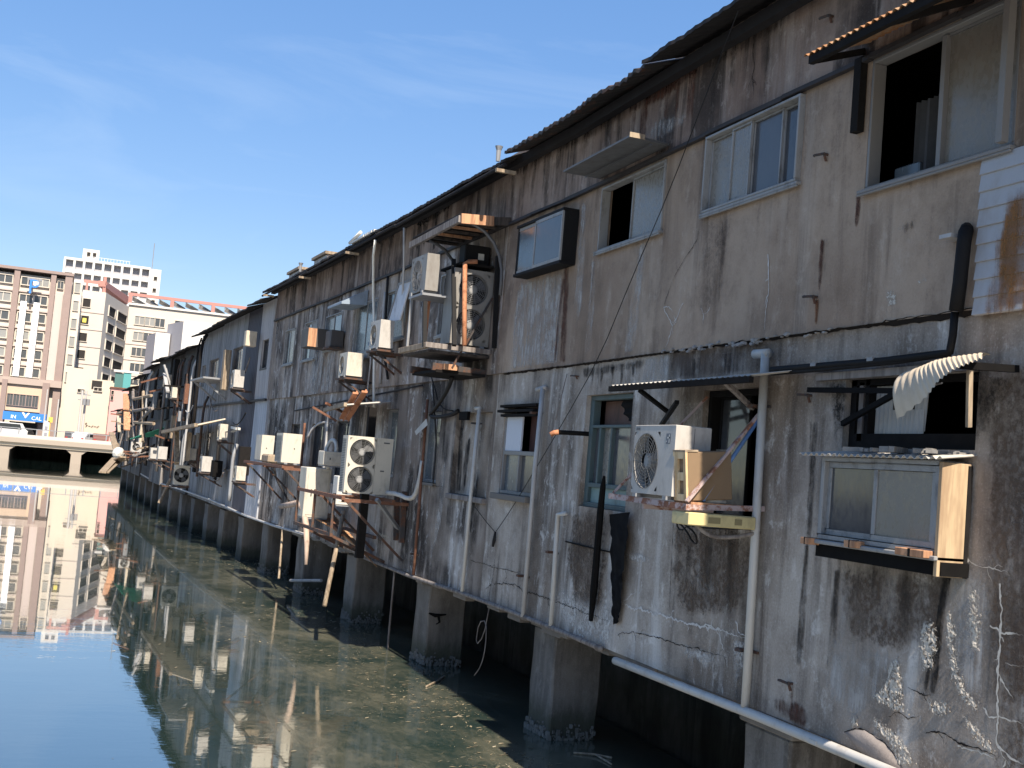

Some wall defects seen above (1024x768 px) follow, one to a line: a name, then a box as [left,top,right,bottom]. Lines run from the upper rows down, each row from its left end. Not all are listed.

rust [987,196,1024,312]
leakage [827,377,1024,713]
flaking render [873,655,918,766]
crack [889,559,1022,768]
flaking render [918,590,997,755]
leakage [996,718,1024,768]